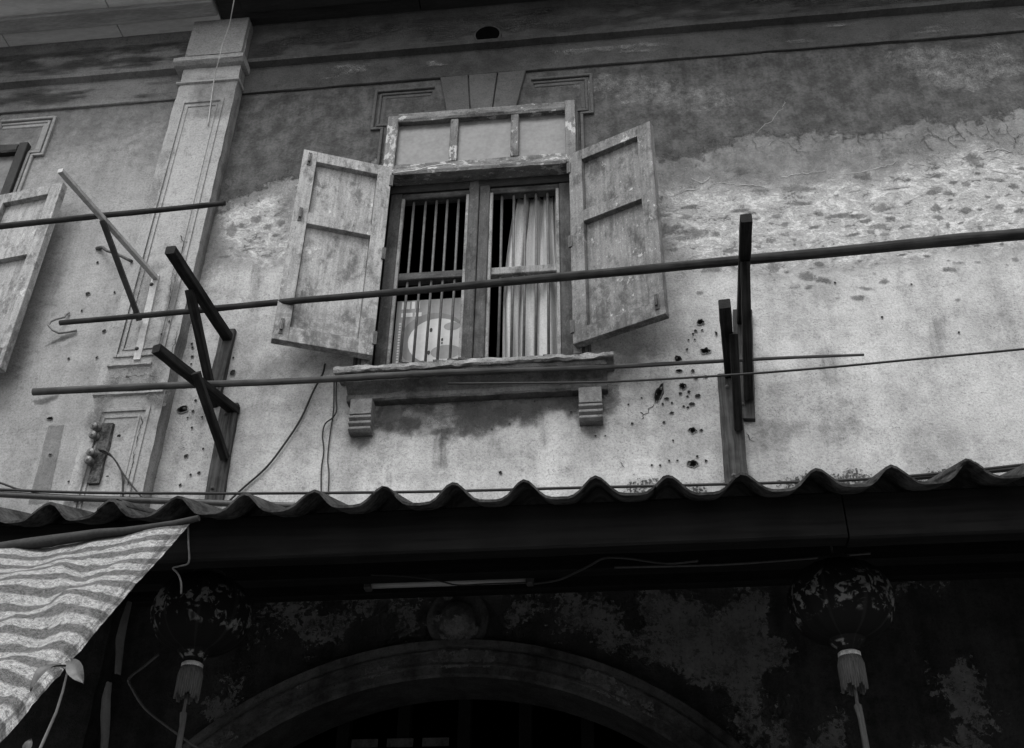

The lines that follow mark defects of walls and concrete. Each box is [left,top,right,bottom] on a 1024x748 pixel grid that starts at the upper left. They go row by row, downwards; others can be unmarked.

crack [752,123,1020,152]
peeling [218,181,298,269]
peeling [658,143,1024,300]
leakage [351,396,579,444]
peeling [502,587,854,748]